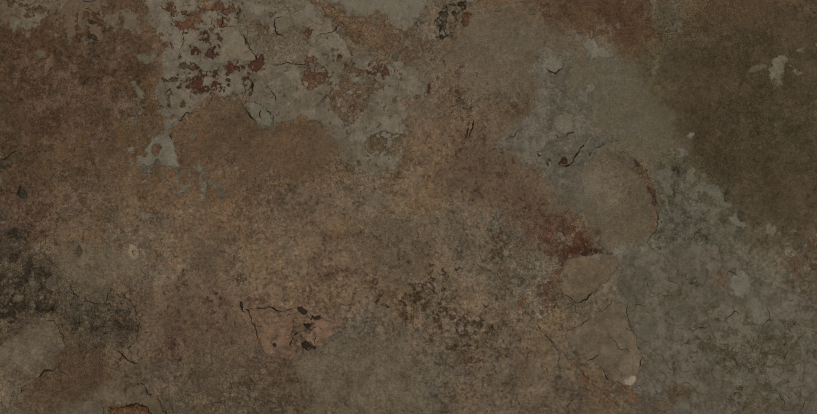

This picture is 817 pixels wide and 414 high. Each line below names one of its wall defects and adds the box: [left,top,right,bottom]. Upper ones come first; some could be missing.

peeling [0,0,474,208]
crack [557,132,656,191]
peeling [496,34,817,414]
crack [1,320,66,405]
crack [65,278,167,414]
peeling [102,395,167,414]
spalling [239,301,343,357]
crack [489,261,677,414]